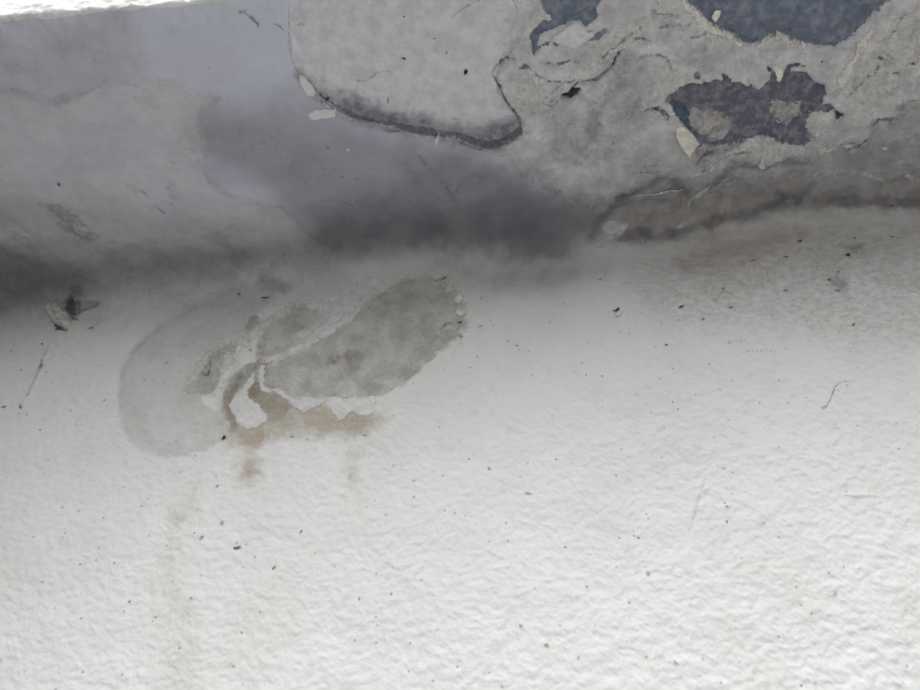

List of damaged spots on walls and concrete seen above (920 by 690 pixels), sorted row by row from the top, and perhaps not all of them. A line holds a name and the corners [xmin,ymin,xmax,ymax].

leakage [0,82,330,294]
peeling [494,0,920,209]
leakage [594,183,858,248]